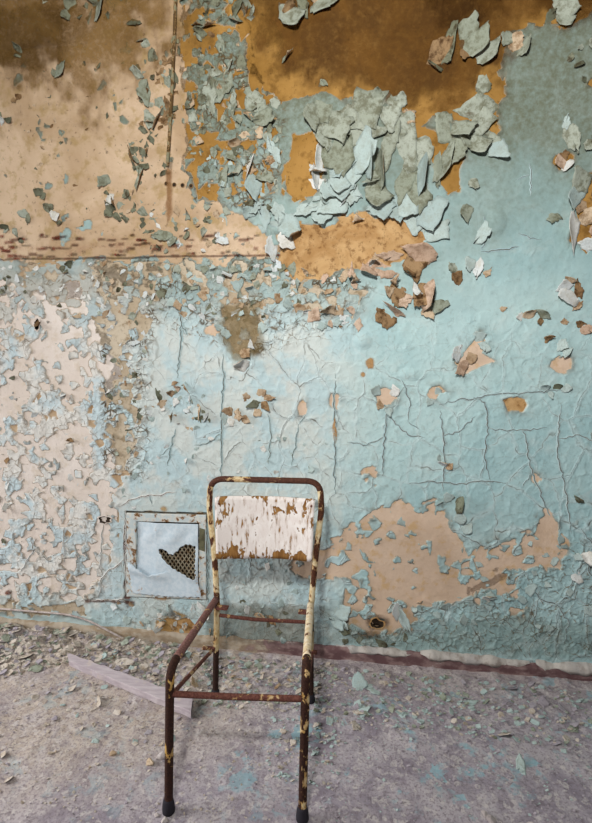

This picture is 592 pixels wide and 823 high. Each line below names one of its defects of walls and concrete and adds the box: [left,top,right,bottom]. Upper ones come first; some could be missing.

peeling [0,0,592,618]
crack [266,414,274,462]
crack [291,415,306,466]
crack [332,374,592,577]
peeling [110,601,214,636]
peeling [285,492,592,677]